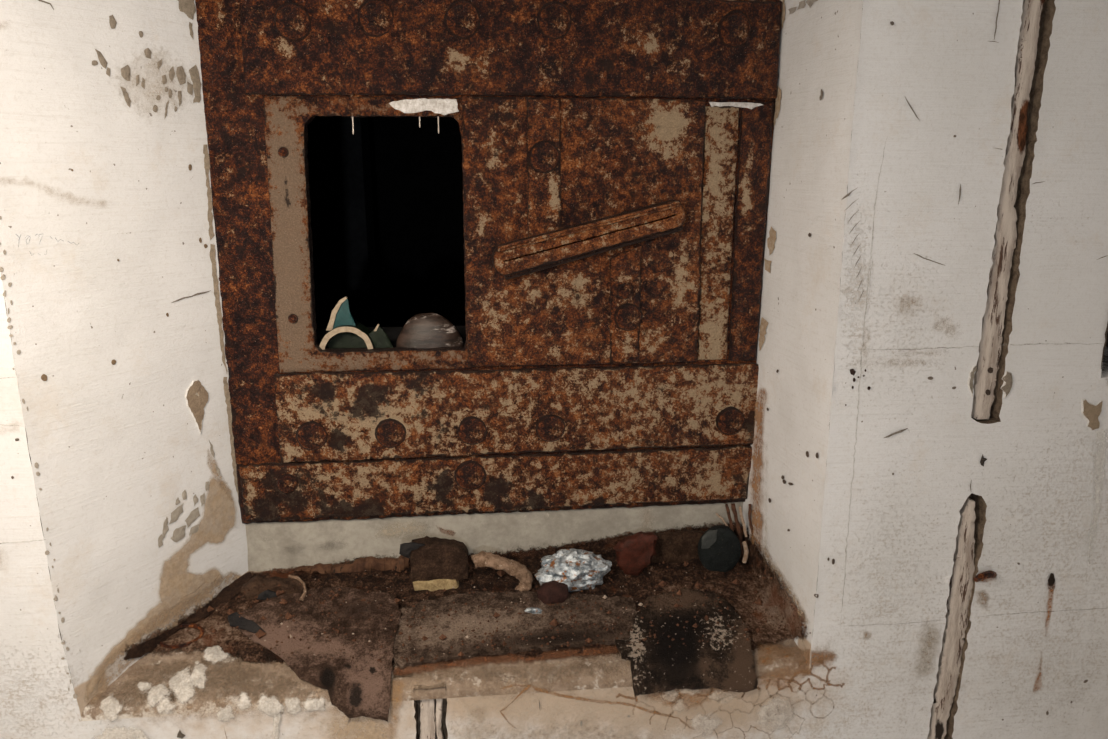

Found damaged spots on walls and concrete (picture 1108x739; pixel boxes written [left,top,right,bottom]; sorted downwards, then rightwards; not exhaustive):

peeling [178,0,196,38]
peeling [92,49,145,107]
peeling [139,31,201,118]
spalling [1000,371,1013,398]
leakage [87,459,241,702]
crack [500,661,845,739]